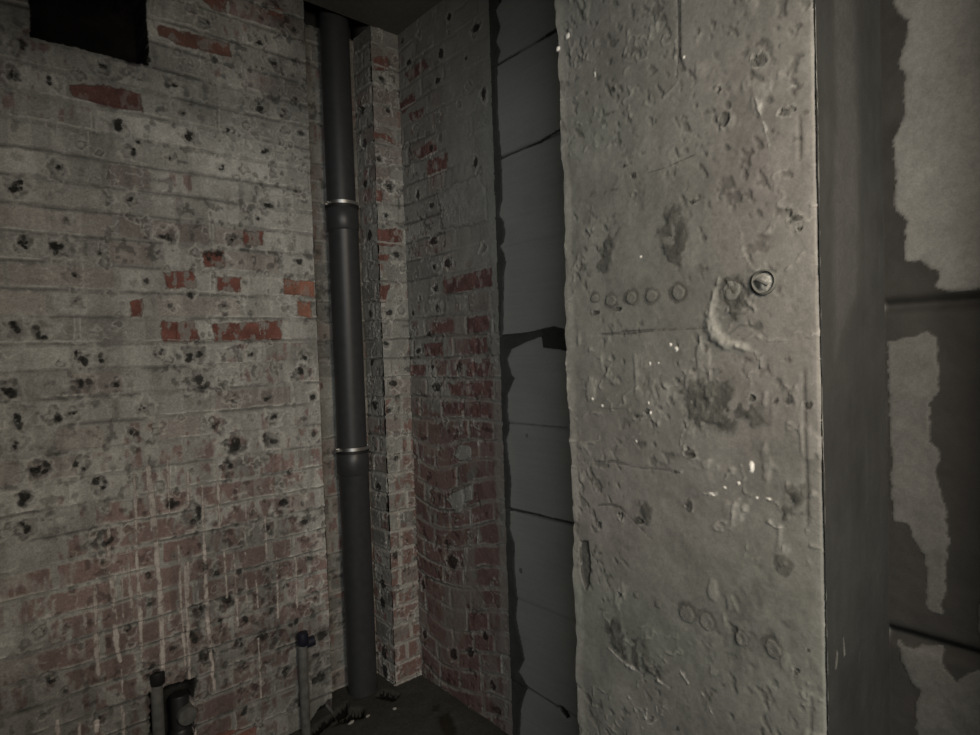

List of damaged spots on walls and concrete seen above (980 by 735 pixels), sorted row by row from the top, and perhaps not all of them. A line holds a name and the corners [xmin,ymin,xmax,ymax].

crack [675,0,683,71]
peeling [892,0,980,292]
peeling [886,331,950,615]
damp [82,586,101,676]
damp [106,466,166,735]
damp [177,545,191,680]
damp [201,485,216,691]
damp [223,550,259,626]
peeling [897,639,980,735]